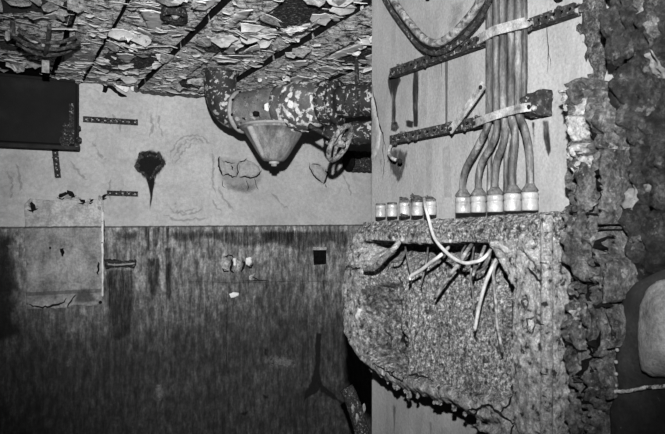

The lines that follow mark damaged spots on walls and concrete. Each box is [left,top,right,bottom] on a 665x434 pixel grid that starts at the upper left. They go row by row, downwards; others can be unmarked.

spalling [0,0,372,132]
rust [388,63,403,135]
rust [406,63,427,127]
peeling [576,0,608,80]
peeling [57,190,107,207]
rust [543,121,551,155]
peeling [576,114,632,230]
leakage [76,290,94,302]
spalling [222,254,263,281]
peeling [561,252,638,348]
leakage [305,333,344,405]
crack [465,384,520,434]